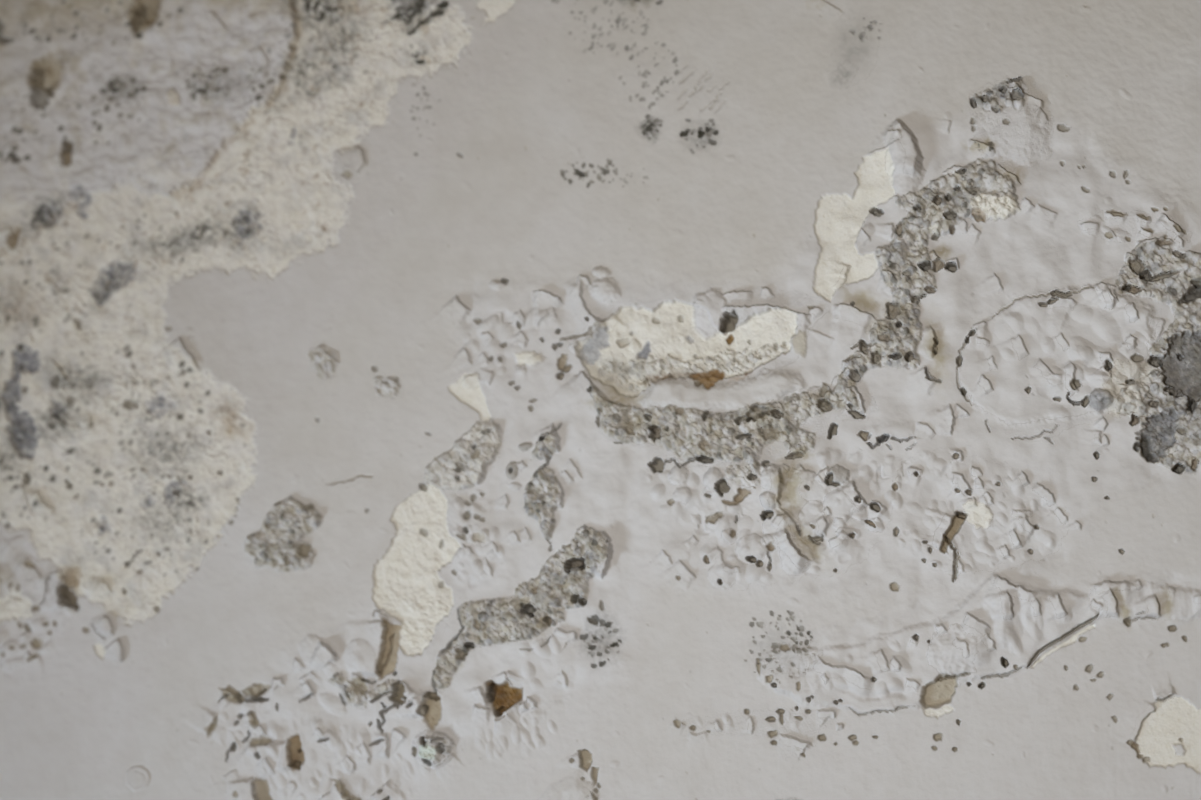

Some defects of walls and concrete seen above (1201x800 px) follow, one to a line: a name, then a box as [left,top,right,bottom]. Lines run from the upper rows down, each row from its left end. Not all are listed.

damp [560,159,650,189]
damp [551,0,730,154]
flaking render [973,77,1049,124]
flaking render [0,0,472,626]
spalling [1103,215,1201,475]
spalling [200,140,1021,800]
peeling [1074,664,1105,690]
peeling [1128,691,1201,774]